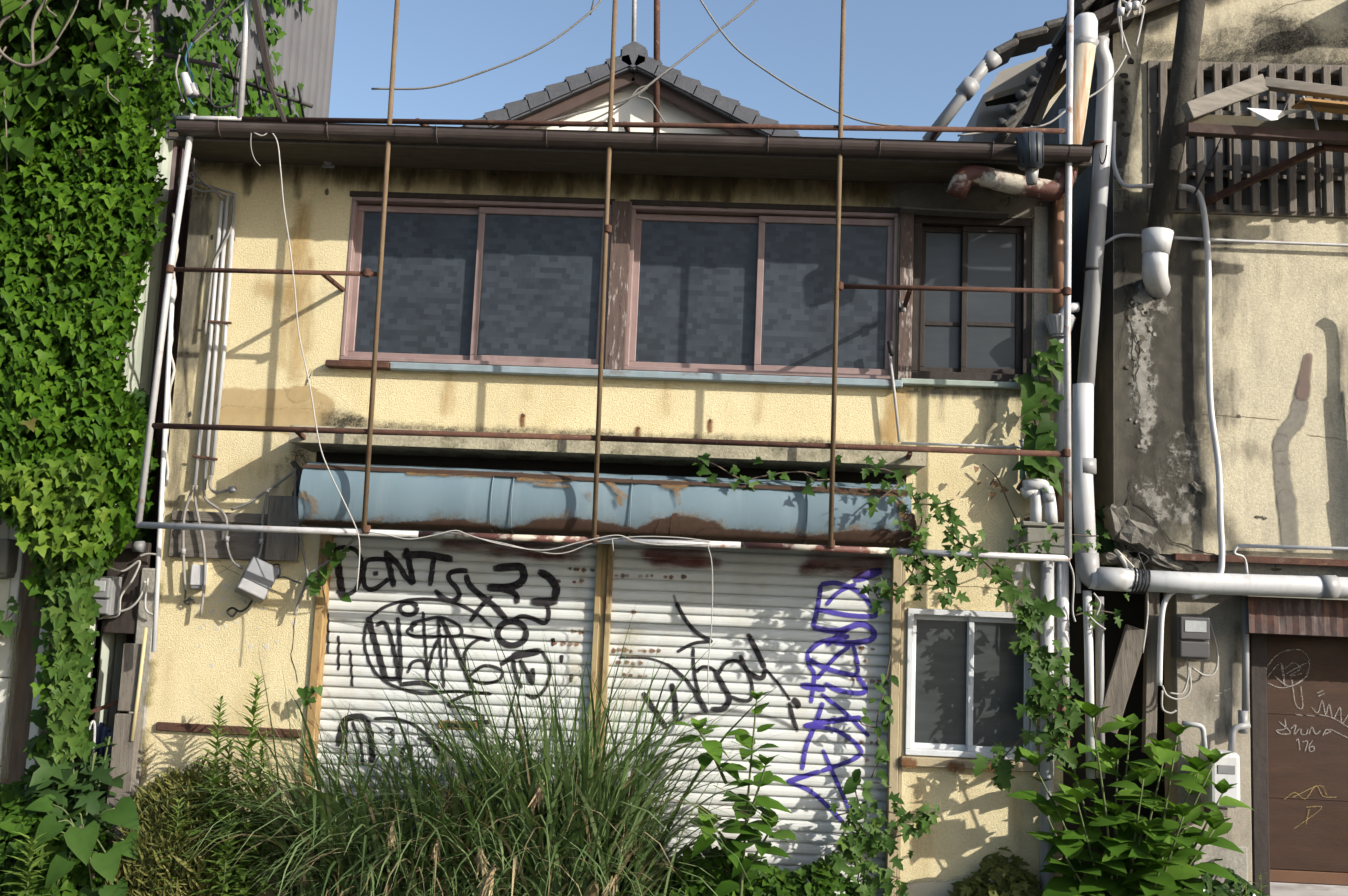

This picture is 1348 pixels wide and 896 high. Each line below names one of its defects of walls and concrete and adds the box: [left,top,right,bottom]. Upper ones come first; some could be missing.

mould [1199,18,1348,65]
damp [198,162,1053,277]
damp [170,188,211,507]
peeling [1123,284,1168,452]
rust [301,464,920,549]